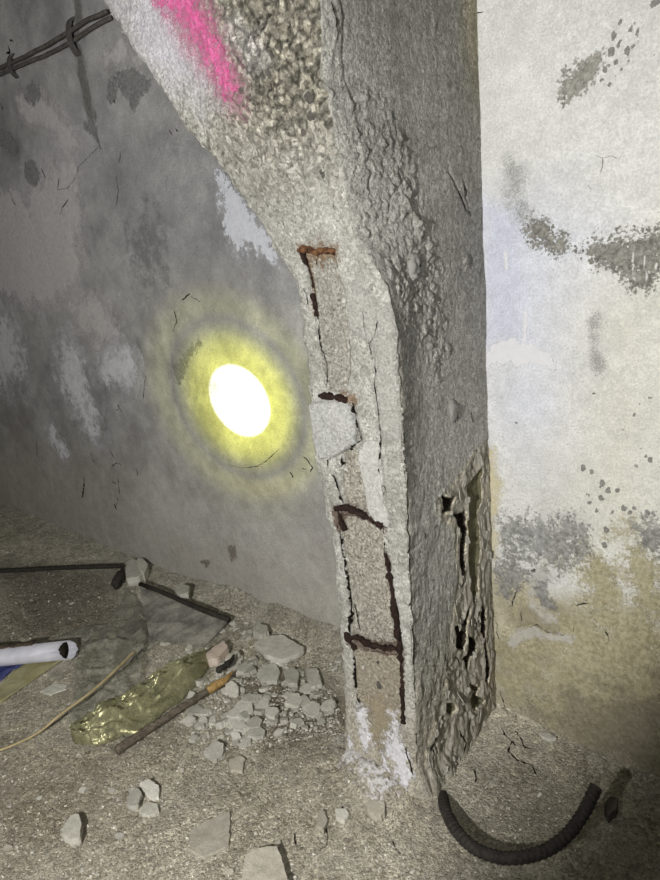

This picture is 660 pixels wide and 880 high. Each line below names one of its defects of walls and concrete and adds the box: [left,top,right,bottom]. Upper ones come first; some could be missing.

mould [600,19,639,87]
mould [509,164,660,298]
spalling [307,253,352,394]
spalling [343,447,401,751]
flaking render [424,440,496,796]
water stain [488,451,660,777]
water stain [334,694,416,803]